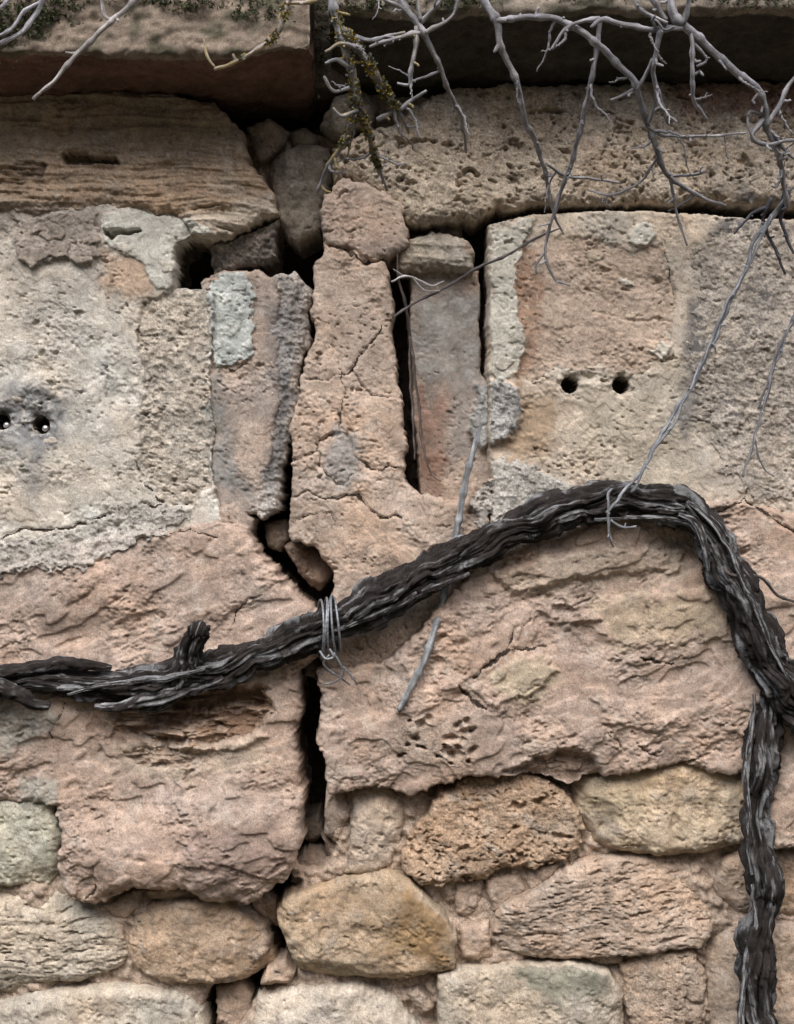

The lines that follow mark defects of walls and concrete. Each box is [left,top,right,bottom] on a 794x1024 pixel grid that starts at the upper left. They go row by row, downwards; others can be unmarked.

crack [189,251,214,290]
crack [462,219,500,376]
crack [257,237,418,604]
crack [302,676,327,809]
crack [276,840,305,892]
crack [253,924,286,998]
crack [205,984,218,1021]